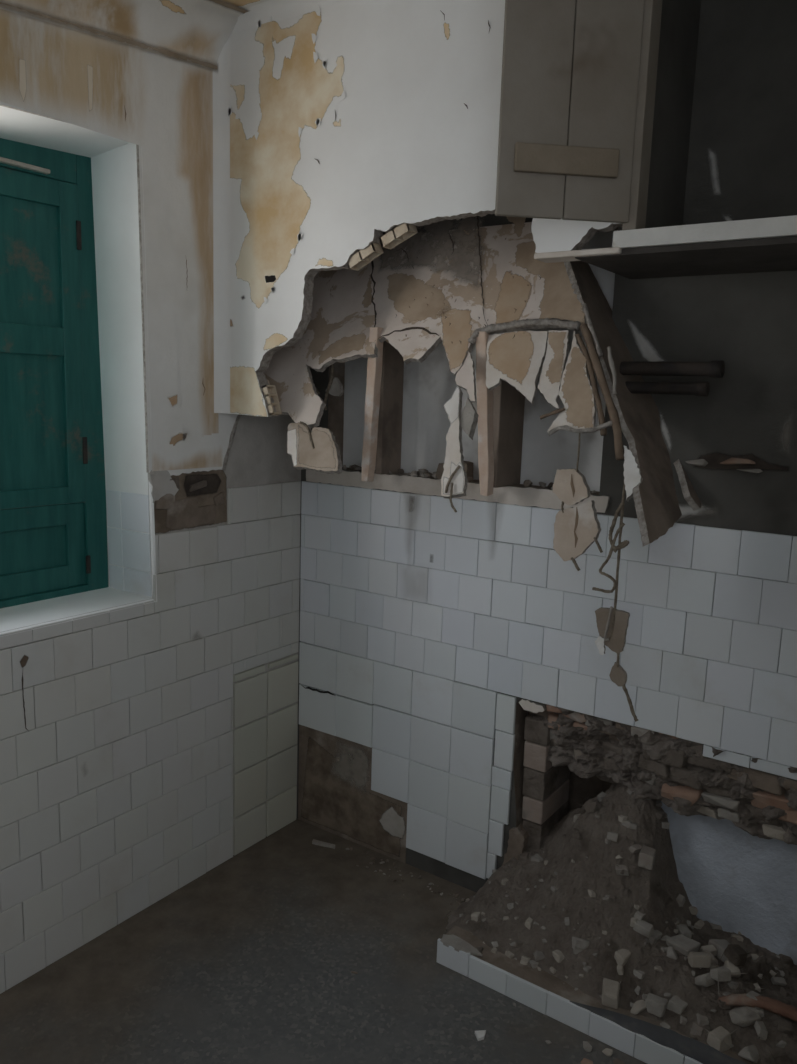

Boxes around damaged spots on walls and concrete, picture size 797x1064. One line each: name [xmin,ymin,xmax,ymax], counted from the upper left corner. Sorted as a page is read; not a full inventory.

peeling [228,5,346,308]
damp [0,0,238,471]
spalling [347,223,418,271]
peeling [264,333,287,350]
spalling [451,301,581,345]
spalling [148,366,282,533]
rust [20,655,29,731]
peeling [298,724,408,863]